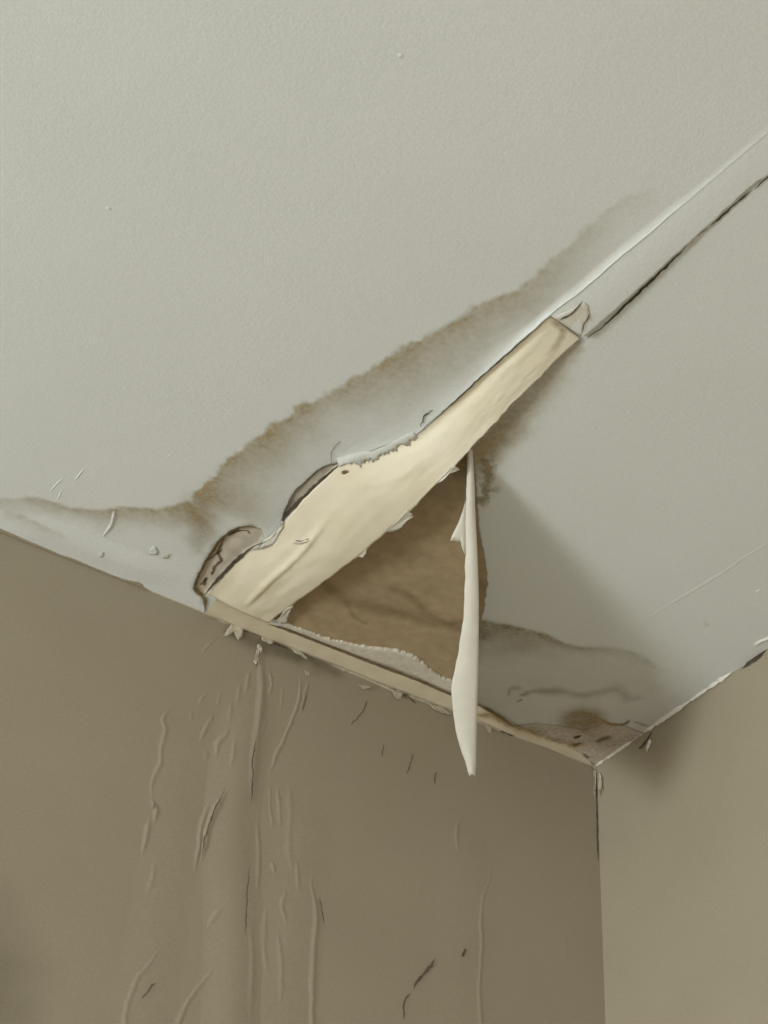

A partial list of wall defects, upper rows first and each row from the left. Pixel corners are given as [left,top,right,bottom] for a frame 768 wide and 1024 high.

crack [417,177,768,435]
water stain [165,478,219,517]
flaking render [282,443,339,518]
water stain [461,424,508,503]
flaking render [193,526,264,612]
water stain [517,723,644,765]